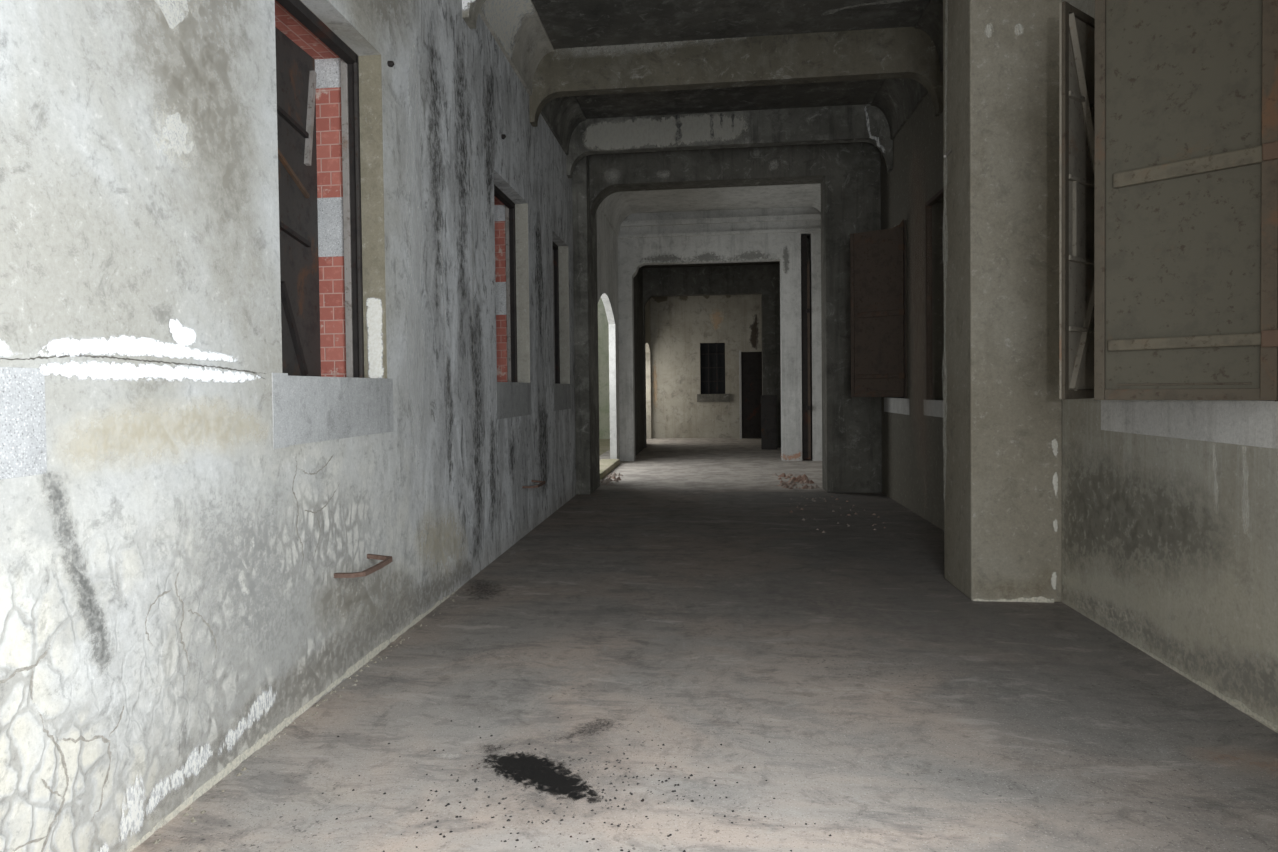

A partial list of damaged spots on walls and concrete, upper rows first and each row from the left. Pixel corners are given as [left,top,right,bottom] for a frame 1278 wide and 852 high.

flaking render [462,0,534,58]
damp [43,473,111,672]
crack [145,573,217,677]
damp [72,37,514,852]
damp [1063,445,1220,573]
damp [1078,599,1278,730]
crack [0,652,124,852]